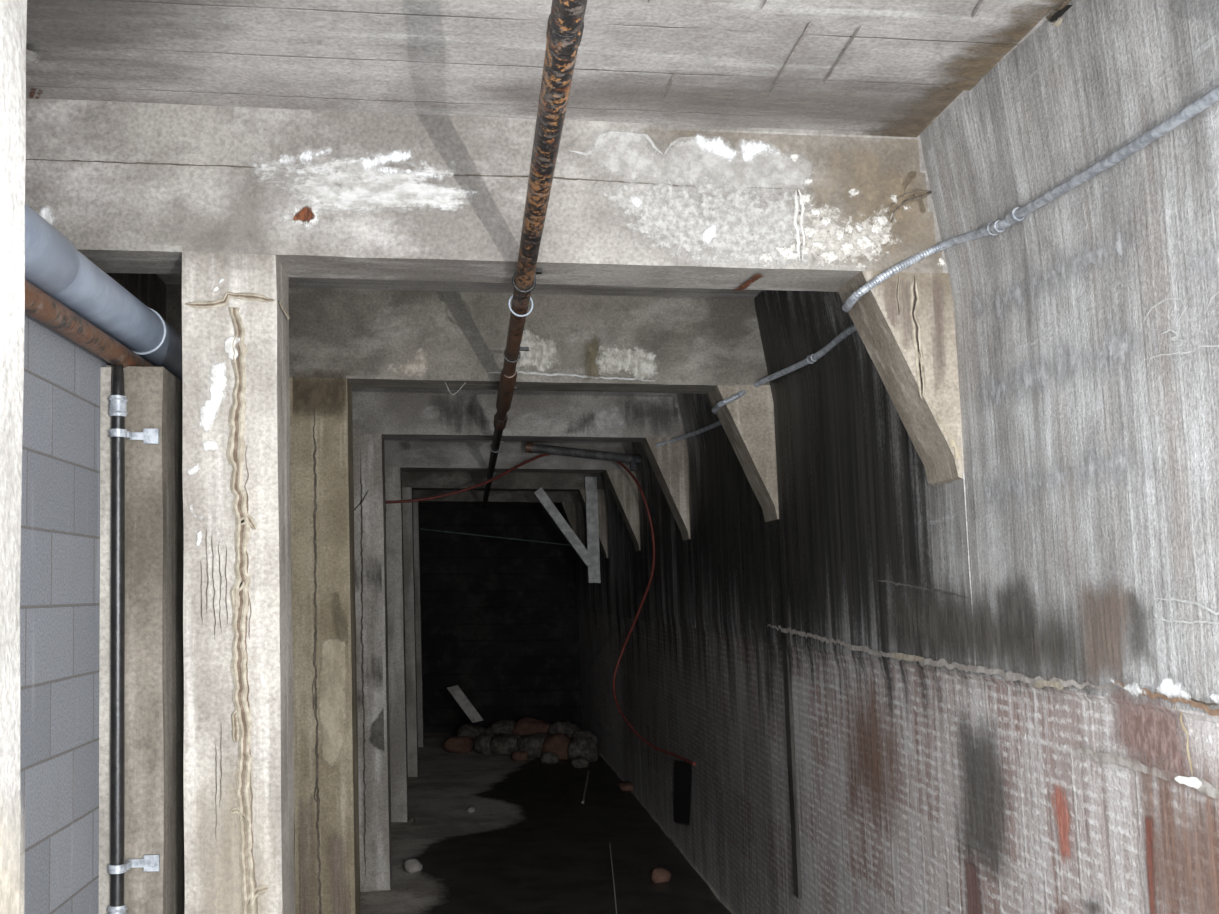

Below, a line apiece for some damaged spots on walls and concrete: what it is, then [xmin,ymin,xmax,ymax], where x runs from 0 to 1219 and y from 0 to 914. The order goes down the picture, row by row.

leakage [584,0,1065,137]
leakage [182,149,475,252]
leakage [569,131,945,268]
leakage [972,232,1124,317]
leakage [516,330,560,373]
leakage [575,282,1219,711]
crack [186,292,290,914]
leakage [959,717,1005,914]
rust [1051,786,1070,861]
leakage [1077,747,1219,799]
rust [1112,681,1219,914]
leakage [1086,901,1100,914]